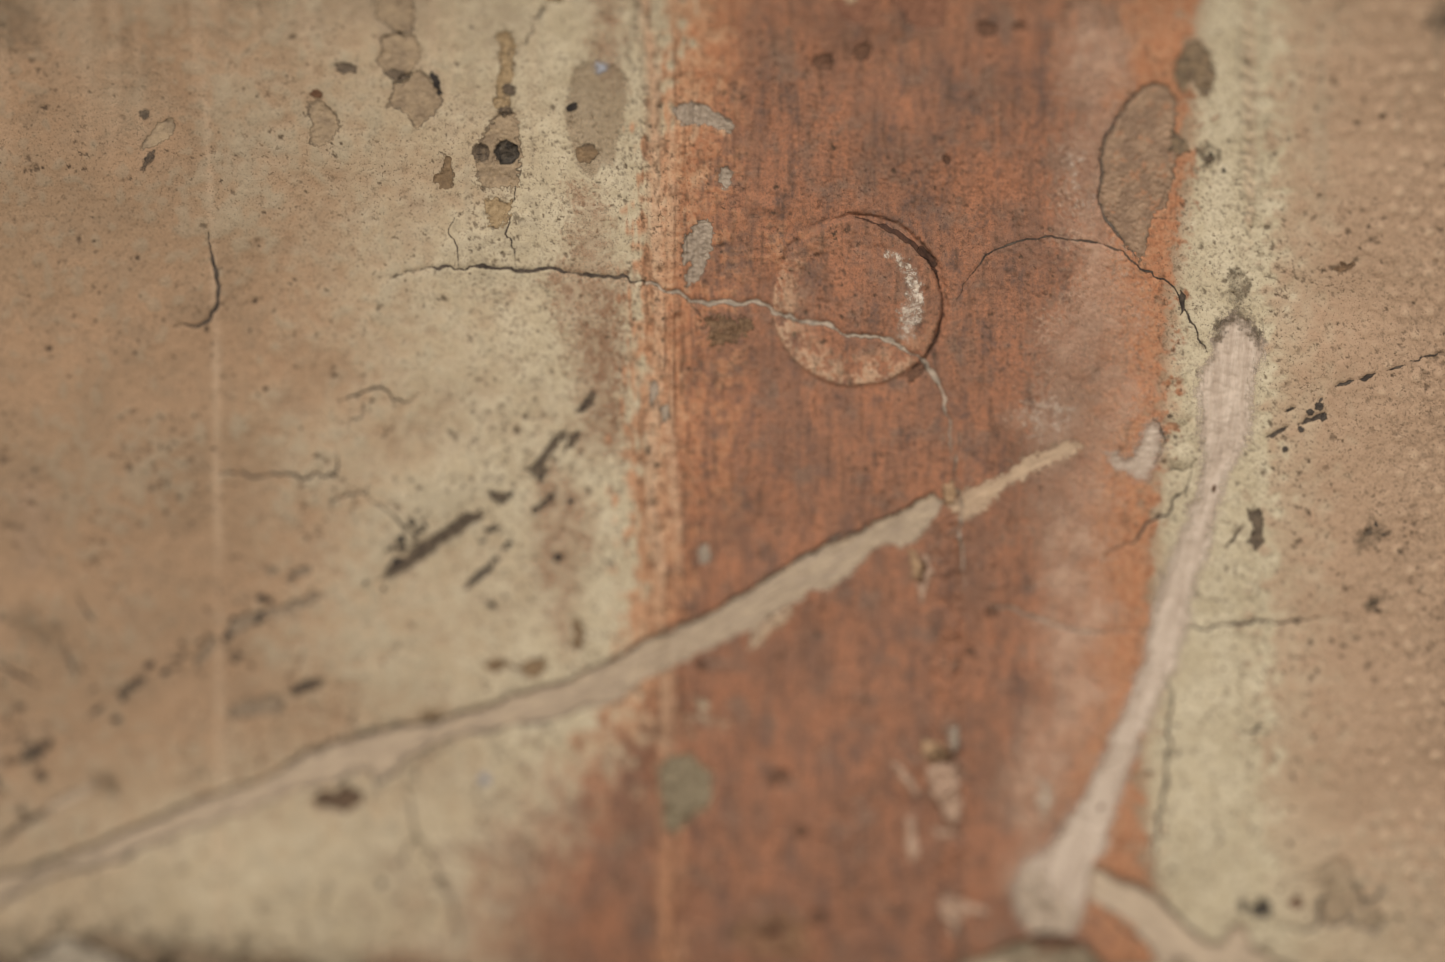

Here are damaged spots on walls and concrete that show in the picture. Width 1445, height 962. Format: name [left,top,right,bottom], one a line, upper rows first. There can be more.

spalling [335,62,357,75]
peeling [376,0,443,128]
spalling [433,156,455,189]
spalling [472,30,524,229]
peeling [1098,40,1216,262]
crack [218,386,418,538]
crack [397,186,1207,634]
leakage [1018,153,1144,478]
spalling [0,439,1085,907]
leakage [1001,311,1282,962]
crack [1186,617,1317,631]
crack [1152,681,1183,886]